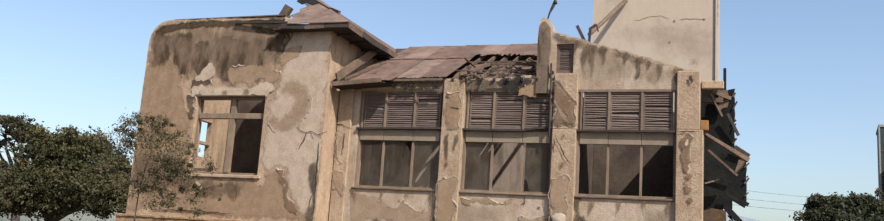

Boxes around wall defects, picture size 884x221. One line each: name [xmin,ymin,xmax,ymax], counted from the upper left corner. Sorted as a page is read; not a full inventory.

water stain [152,18,293,81]
water stain [539,33,683,82]
peeling [129,31,332,221]
water stain [306,163,316,221]
crack [297,124,352,210]
peeling [331,132,513,221]
peeling [518,173,571,221]